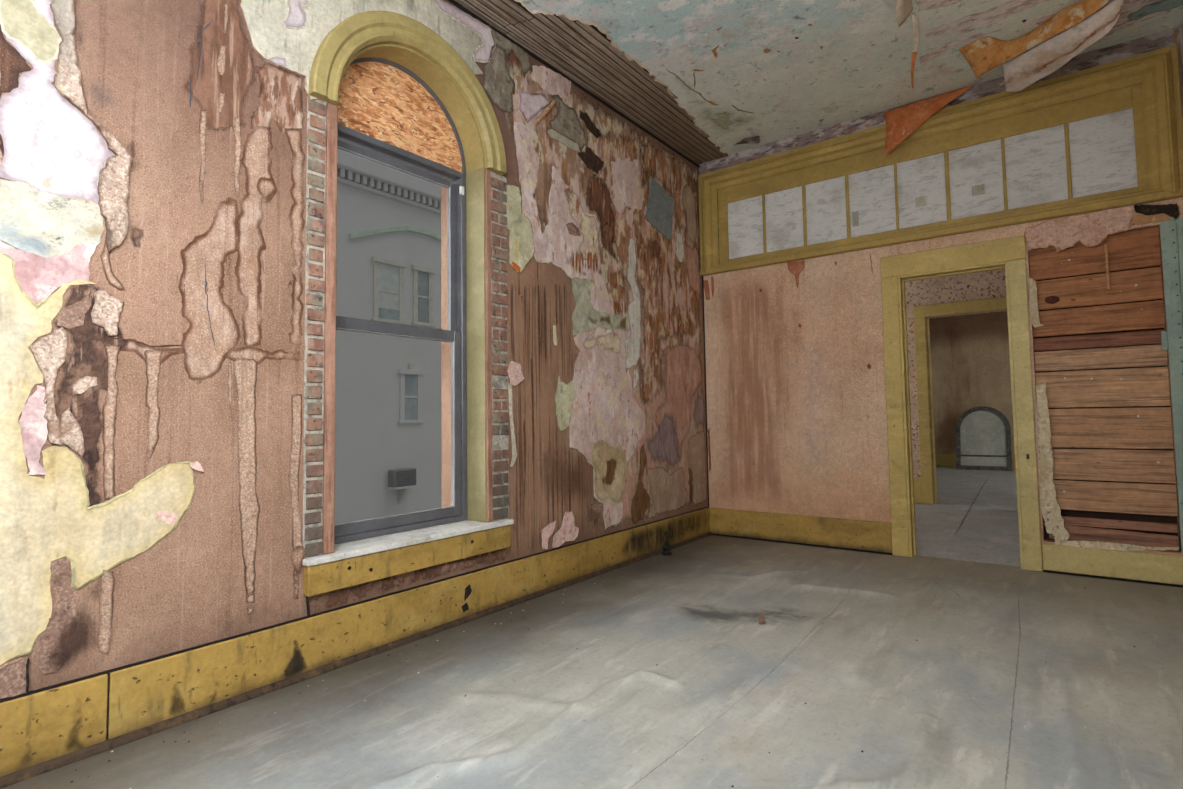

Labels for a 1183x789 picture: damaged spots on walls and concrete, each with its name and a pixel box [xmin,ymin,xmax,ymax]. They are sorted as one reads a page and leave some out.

flaking render [0,0,116,206]
flaking render [0,241,204,666]
peeling [541,511,579,549]
flaking render [491,65,703,529]